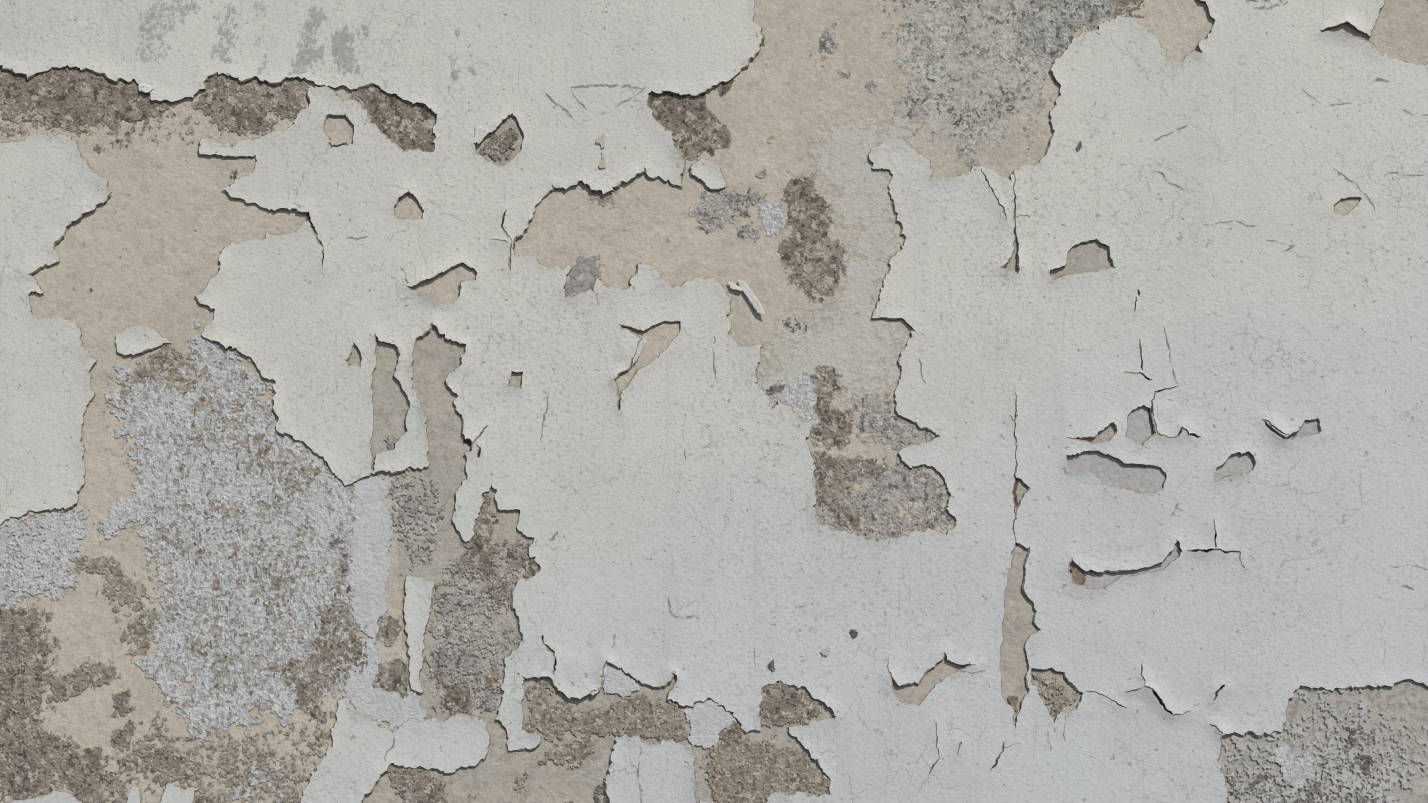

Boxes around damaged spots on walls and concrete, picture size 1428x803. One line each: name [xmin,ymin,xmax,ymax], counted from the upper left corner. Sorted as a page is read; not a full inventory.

peeling [1321,0,1428,65]
peeling [1334,198,1361,216]
peeling [514,0,1215,541]
peeling [0,66,835,803]
peeling [1214,452,1254,482]
peeling [1264,419,1320,439]
peeling [1000,544,1082,725]
peeling [1215,680,1428,803]